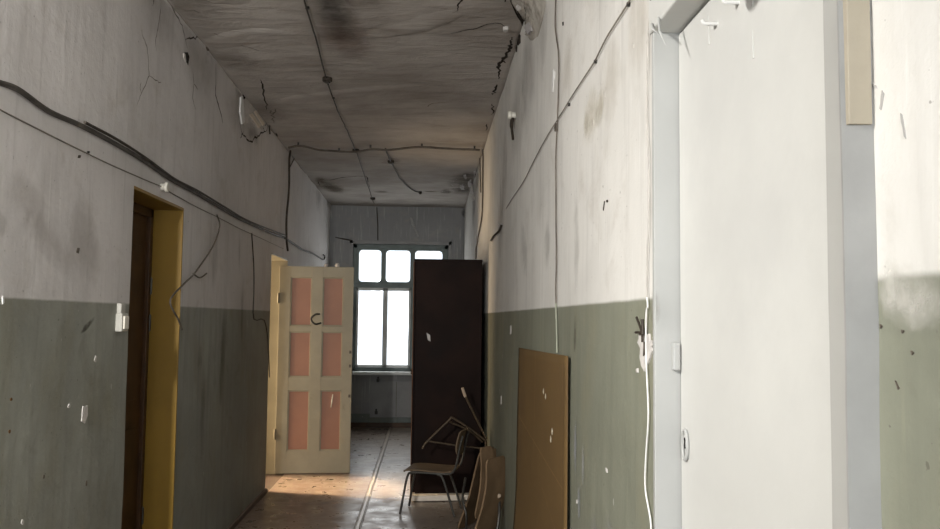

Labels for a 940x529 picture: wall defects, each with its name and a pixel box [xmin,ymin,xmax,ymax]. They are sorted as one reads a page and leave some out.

crack [451,0,526,130]
flaking render [634,316,653,373]